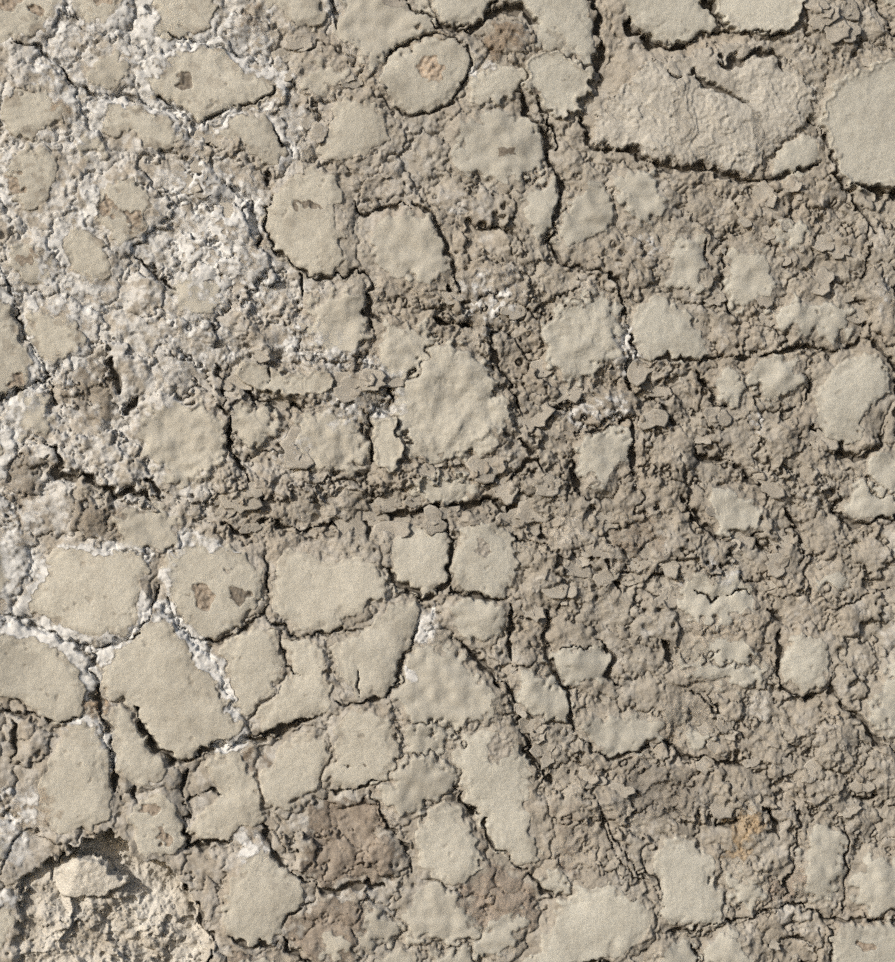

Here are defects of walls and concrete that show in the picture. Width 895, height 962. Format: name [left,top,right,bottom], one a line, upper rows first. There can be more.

efflorescence [0,153,18,206]
efflorescence [0,184,107,328]
damp [21,0,312,308]
damp [160,308,238,378]
spalling [136,134,895,641]
crack [590,0,784,103]
crack [482,92,895,462]
damp [0,325,262,795]
crack [135,706,230,850]
spalling [0,503,895,962]
crack [362,497,553,784]
crack [541,611,748,766]